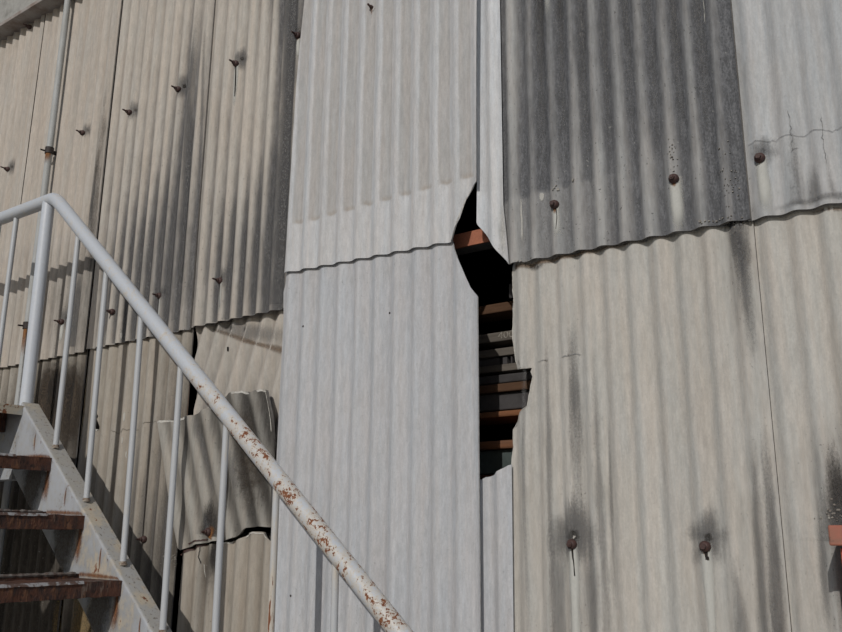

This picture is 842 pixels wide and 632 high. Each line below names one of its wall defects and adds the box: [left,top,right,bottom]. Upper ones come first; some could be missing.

crack [749,110,838,162]
water stain [214,0,300,321]
water stain [669,176,683,223]
water stain [516,246,611,269]
corrosion [23,470,49,510]
water stain [828,461,842,525]
corrosion [53,529,82,571]
crack [180,532,267,564]
water stain [557,509,591,632]
corrosion [71,596,118,632]